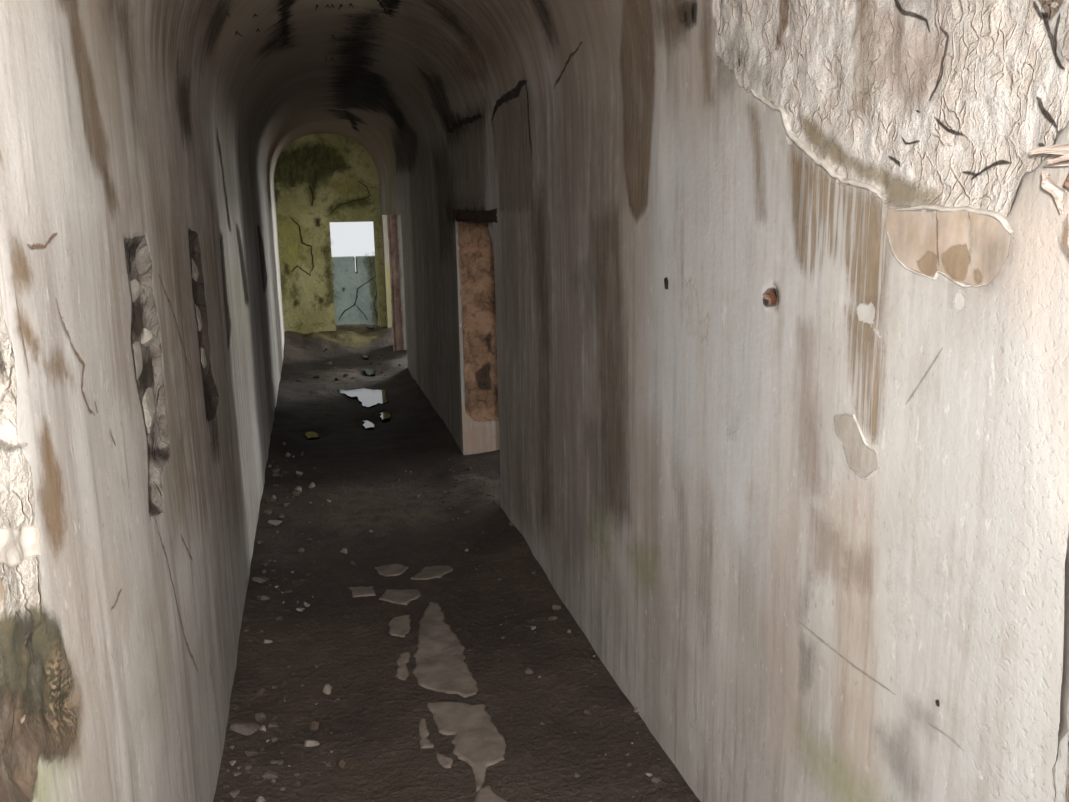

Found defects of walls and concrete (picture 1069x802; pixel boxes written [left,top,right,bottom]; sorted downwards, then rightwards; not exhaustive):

spalling [0,293,81,802]
spalling [125,235,170,516]
spalling [188,229,219,449]
crack [288,181,370,276]
crack [339,276,377,319]
spalling [458,221,499,421]
damp [620,0,654,219]
spalling [678,0,697,27]
peeling [834,414,879,480]
spalling [712,0,1069,310]